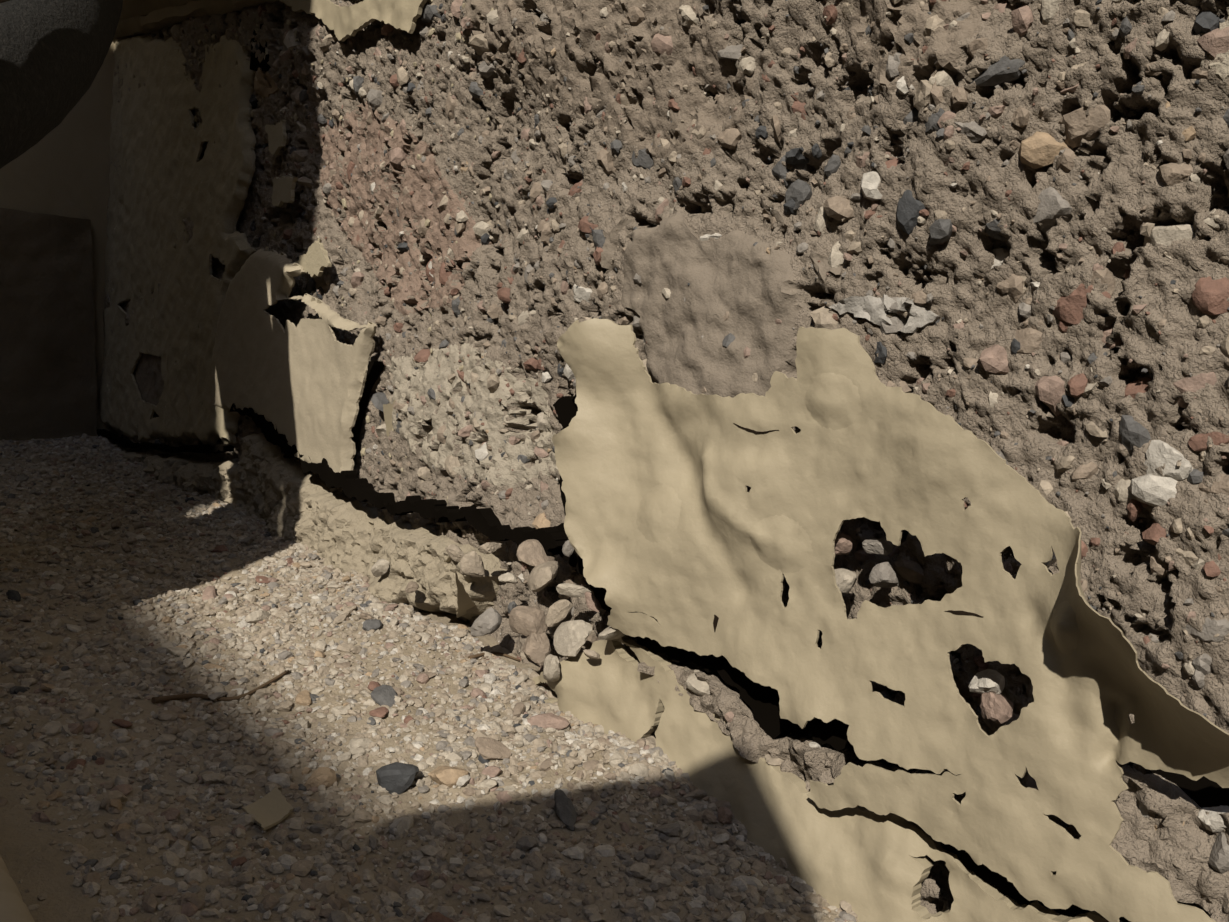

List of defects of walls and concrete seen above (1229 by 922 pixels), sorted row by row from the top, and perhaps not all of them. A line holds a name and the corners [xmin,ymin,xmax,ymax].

spalling [367,502,586,664]
spalling [564,596,610,640]
spalling [782,576,790,607]
spalling [833,517,963,619]
spalling [667,662,847,791]
spalling [871,681,905,706]
spalling [948,644,994,736]
spalling [987,661,1034,716]
crack [1128,762,1229,808]
spalling [920,855,954,914]
crack [941,842,1090,916]
spalling [1111,763,1229,922]